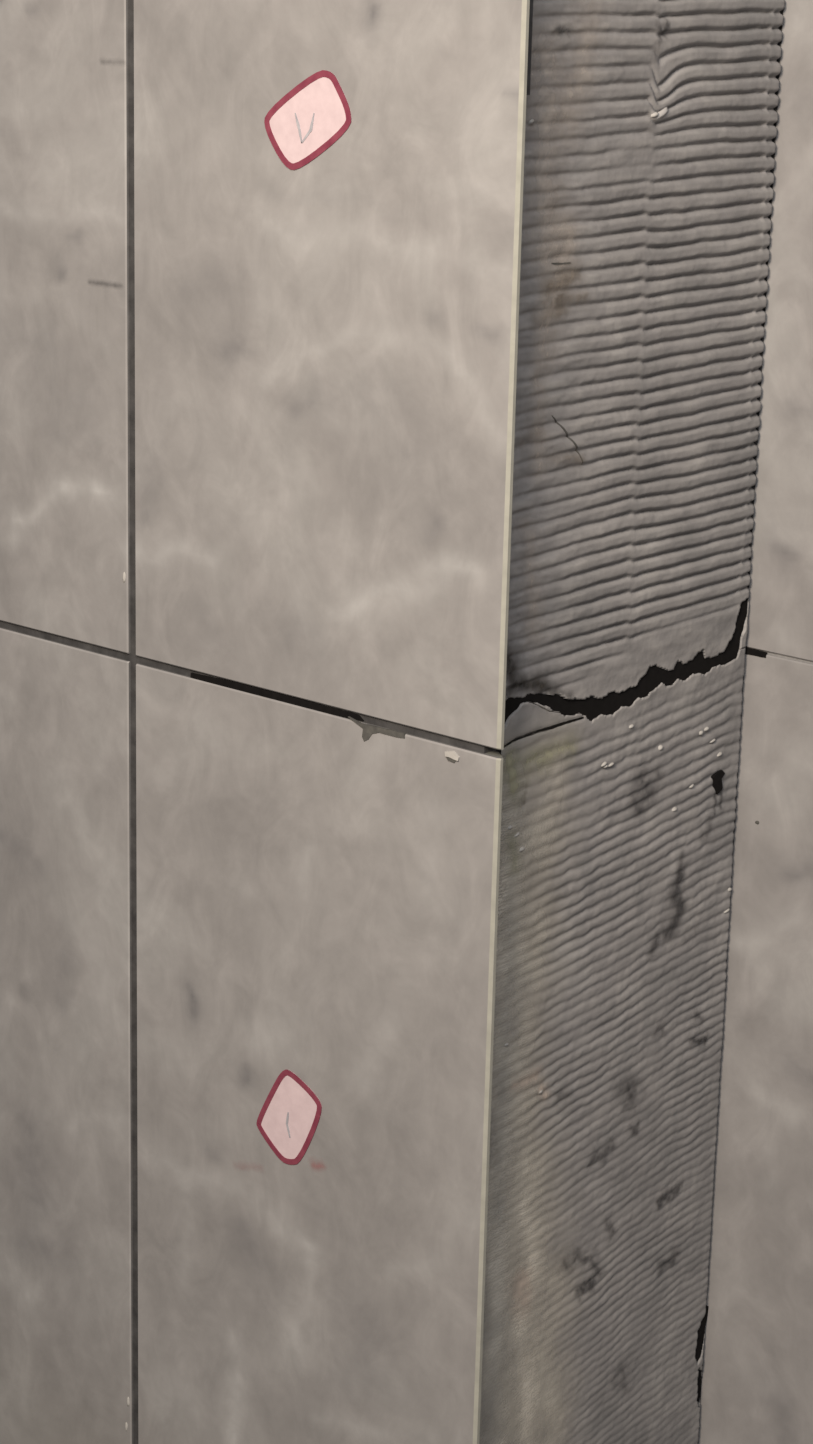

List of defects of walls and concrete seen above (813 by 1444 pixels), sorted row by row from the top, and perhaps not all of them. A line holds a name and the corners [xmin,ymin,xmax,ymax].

crack [504,598,748,748]
leakage [651,870,684,953]